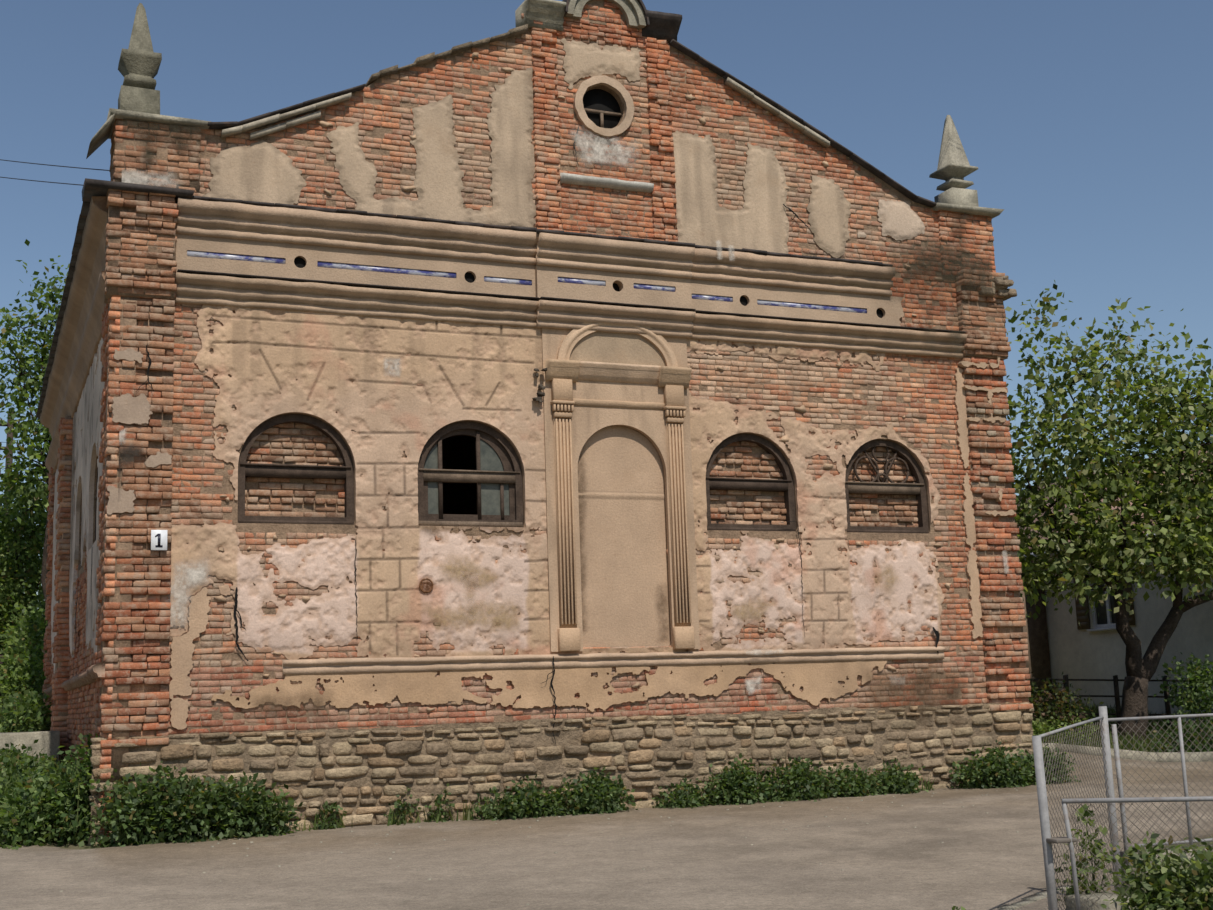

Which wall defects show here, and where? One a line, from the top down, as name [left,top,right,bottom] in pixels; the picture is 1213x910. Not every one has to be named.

spalling [200,25,943,280]
crack [136,345,154,392]
spalling [168,303,988,734]
crack [233,587,249,661]
crack [540,656,557,744]